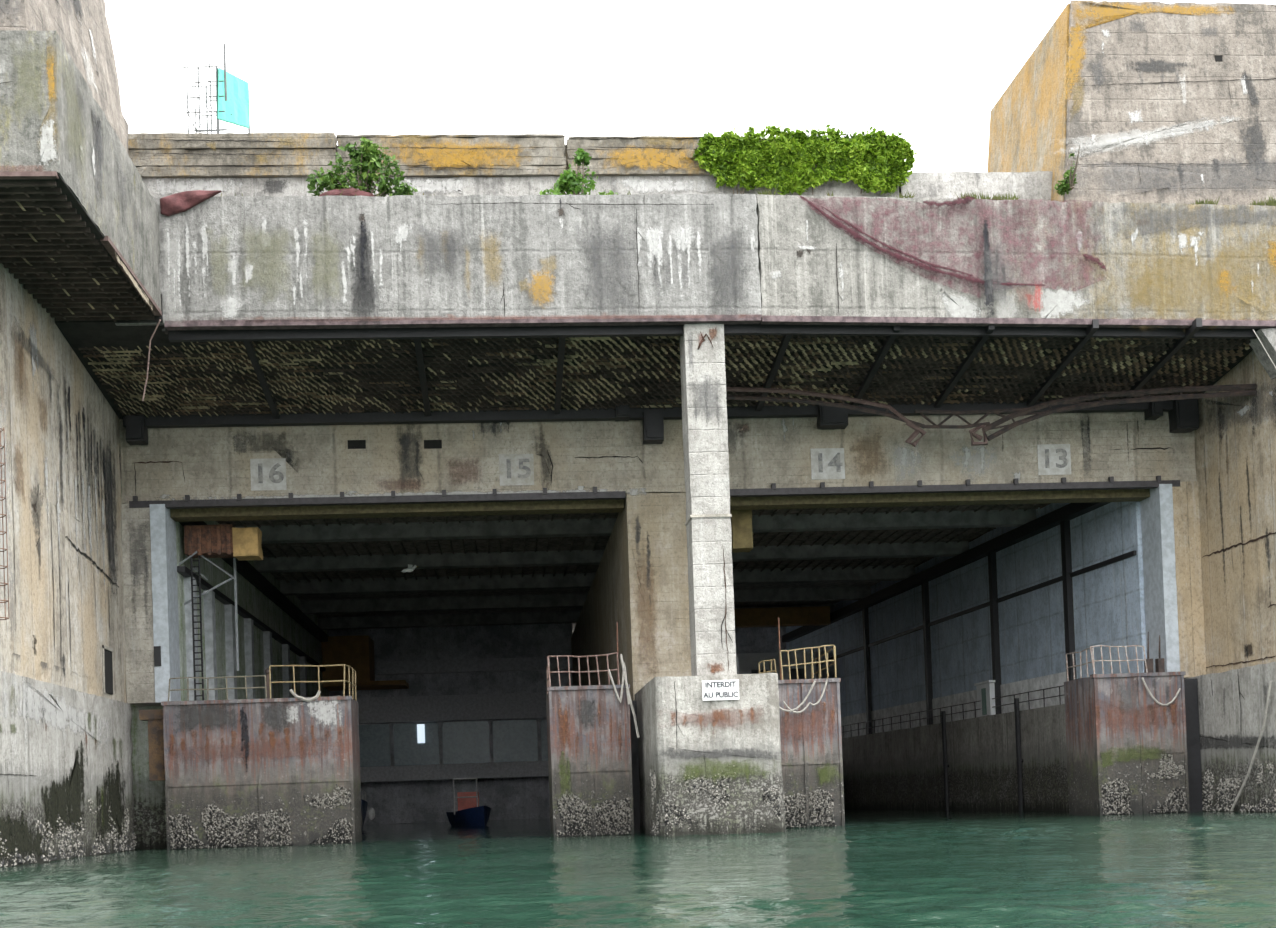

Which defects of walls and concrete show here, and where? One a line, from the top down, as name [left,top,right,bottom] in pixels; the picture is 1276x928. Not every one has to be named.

leakage [341,213,411,323]
crack [50,502,119,676]
leakage [4,674,108,825]
rust [171,724,344,758]
rust [559,697,622,760]